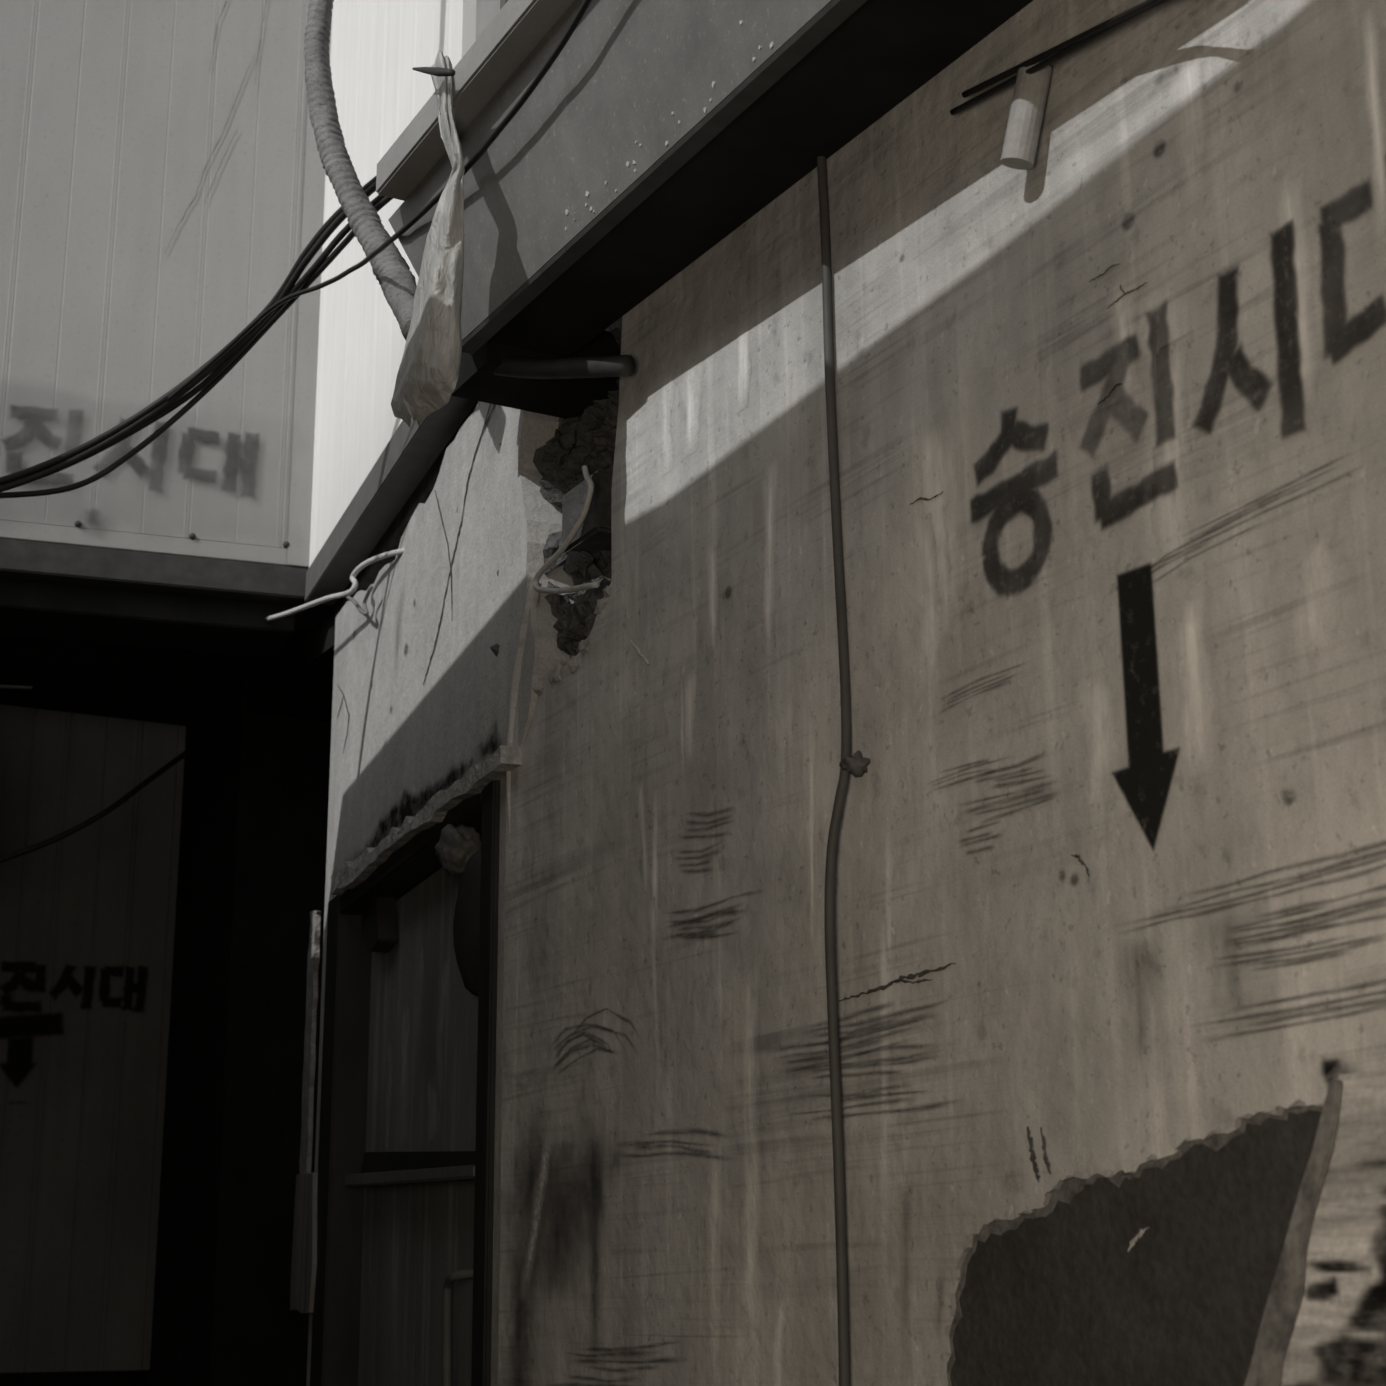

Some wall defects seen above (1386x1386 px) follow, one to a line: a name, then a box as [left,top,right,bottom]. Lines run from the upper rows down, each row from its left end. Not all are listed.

spalling [532,377,620,697]
crack [839,963,955,1002]
flaking render [944,1100,1324,1386]